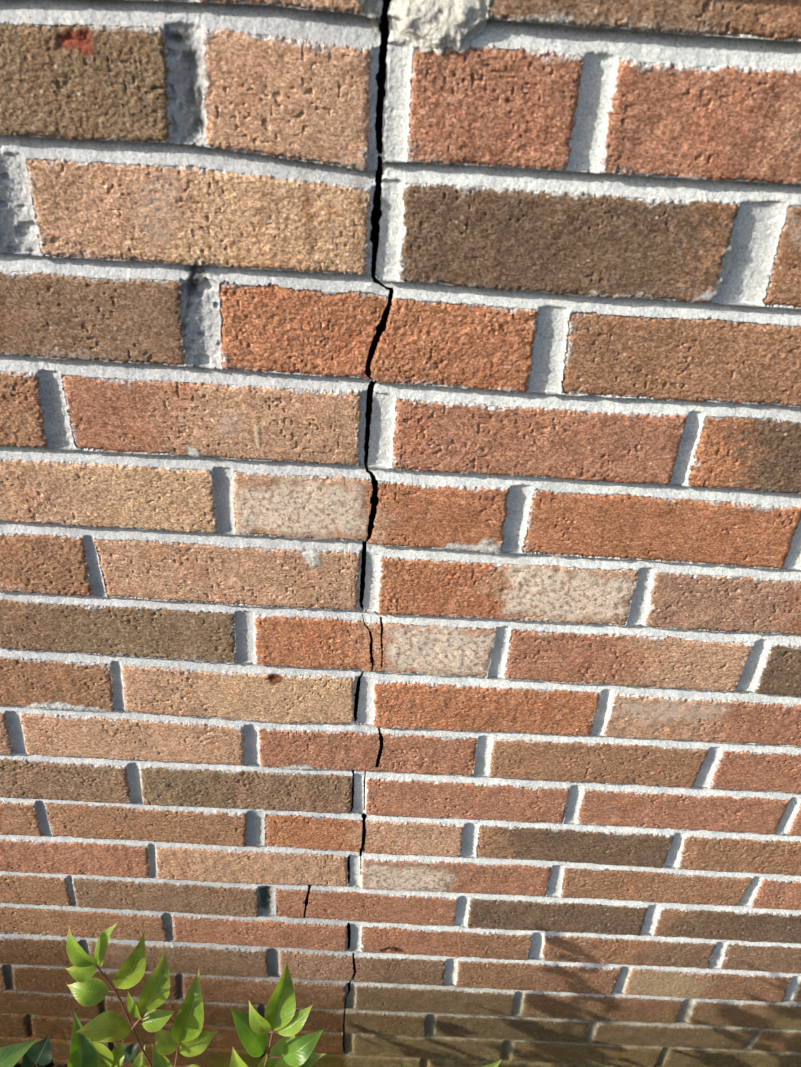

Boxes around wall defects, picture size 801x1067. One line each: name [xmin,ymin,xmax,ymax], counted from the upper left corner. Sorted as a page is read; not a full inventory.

crack [347,0,394,869]
crack [343,922,357,1043]